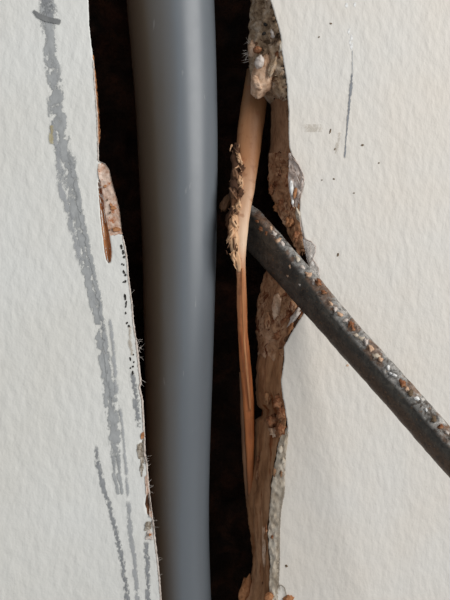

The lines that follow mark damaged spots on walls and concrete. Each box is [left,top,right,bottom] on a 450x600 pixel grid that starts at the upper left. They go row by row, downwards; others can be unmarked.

damp [33,0,129,496]
flaking render [98,164,123,262]
peeling [226,144,246,264]
flaking render [243,0,320,278]
damp [95,448,151,600]
damp [131,373,141,427]
flaking render [137,432,153,540]
flaking render [238,271,303,600]